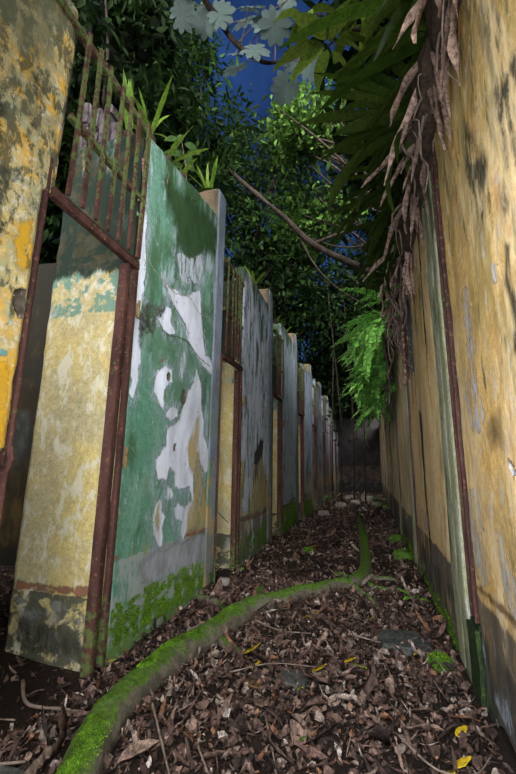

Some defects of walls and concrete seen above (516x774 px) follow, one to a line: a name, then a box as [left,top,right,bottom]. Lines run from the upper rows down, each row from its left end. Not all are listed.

water stain [494,54,516,135]
water stain [0,166,9,203]
water stain [464,127,486,192]
peeling [128,184,212,583]
water stain [13,410,31,469]